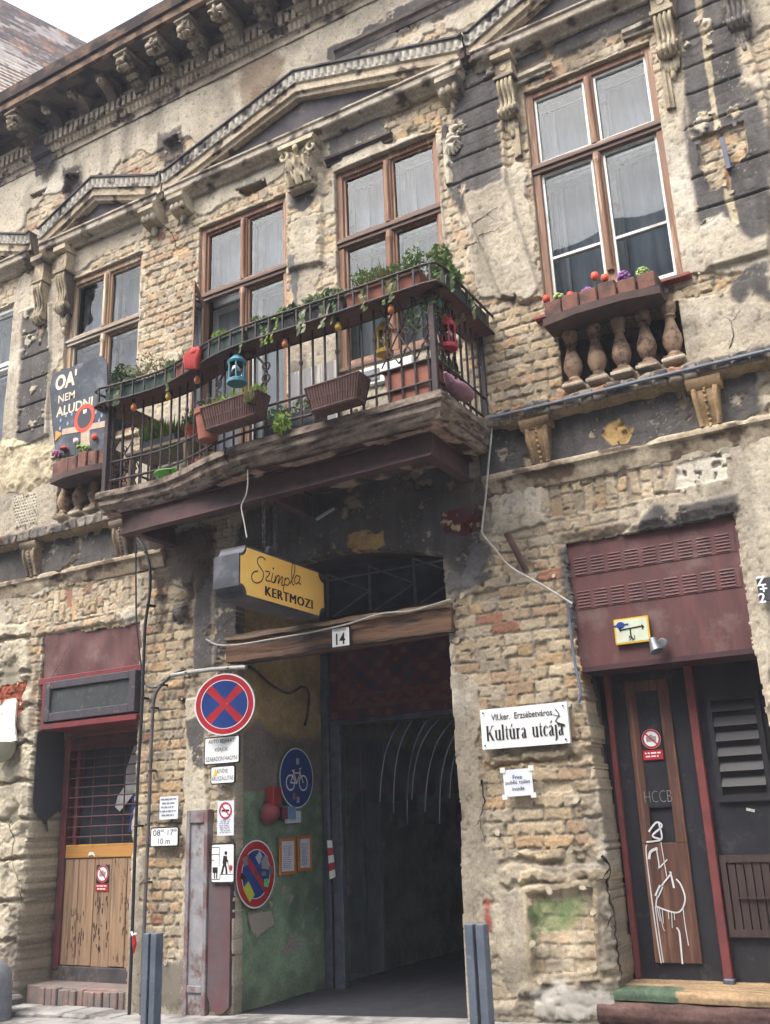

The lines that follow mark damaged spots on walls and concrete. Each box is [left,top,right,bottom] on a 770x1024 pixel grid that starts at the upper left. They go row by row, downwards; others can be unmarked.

flaking render [694,0,751,223]
peeling [590,418,634,445]
flaking render [675,451,731,492]
peeling [348,528,385,550]
flaking render [441,505,582,709]
flaking render [0,680,28,734]
crack [595,855,622,977]